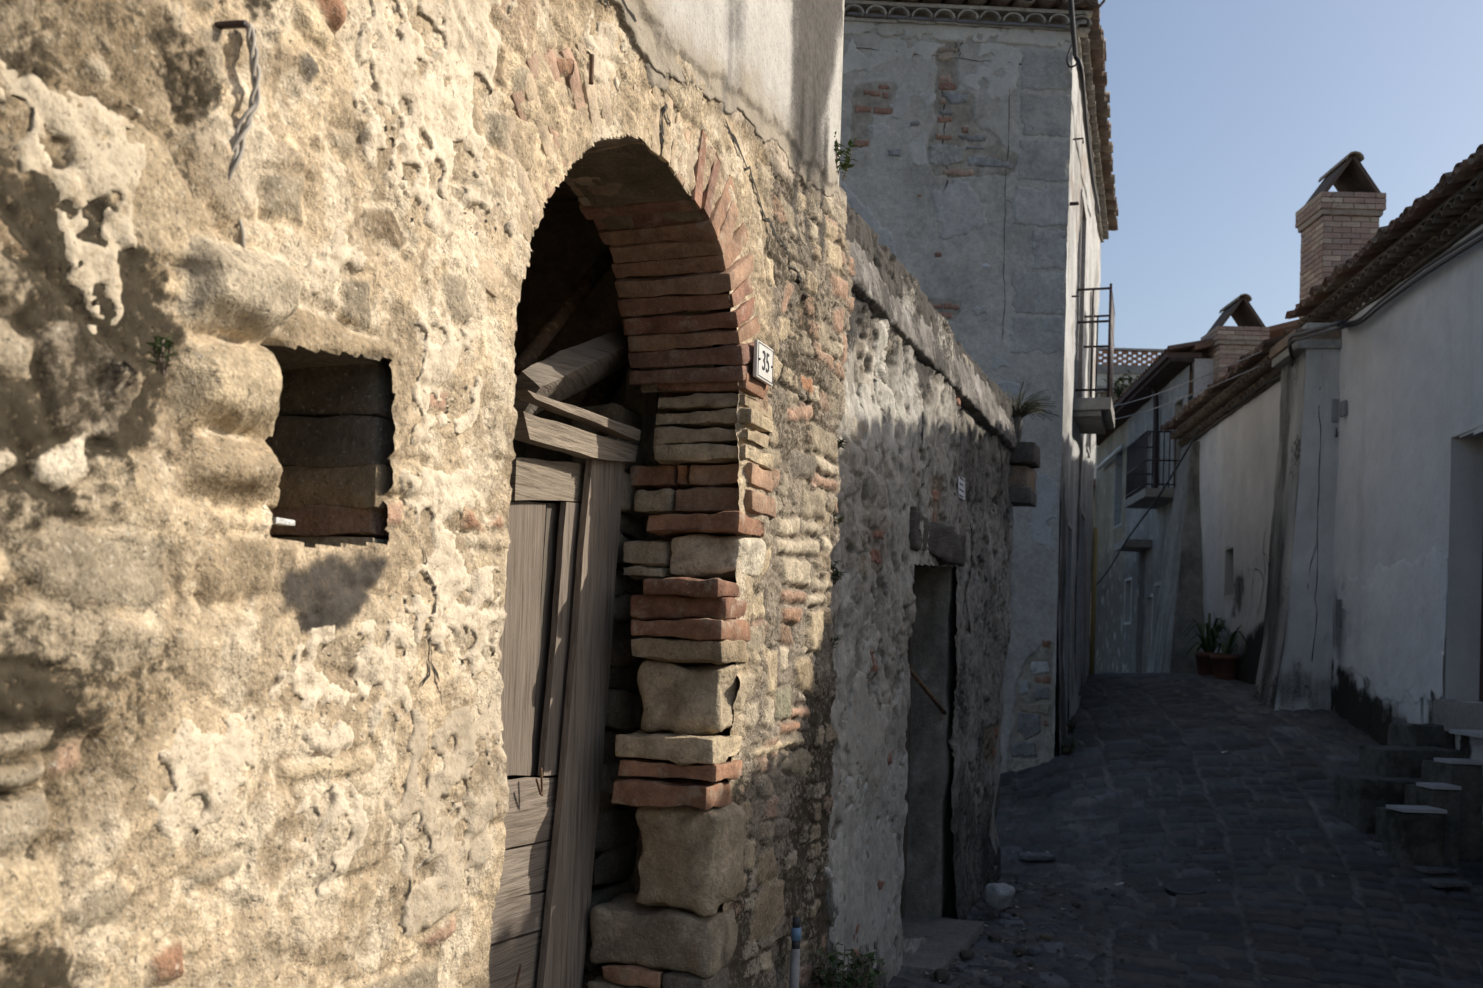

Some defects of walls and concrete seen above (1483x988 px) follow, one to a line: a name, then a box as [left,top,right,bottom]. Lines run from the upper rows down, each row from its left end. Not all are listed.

peeling [350,0,518,238]
peeling [547,181,583,215]
peeling [584,0,1022,207]
water stain [1231,364,1407,745]
spalling [983,640,1055,772]
water stain [1459,735,1471,759]